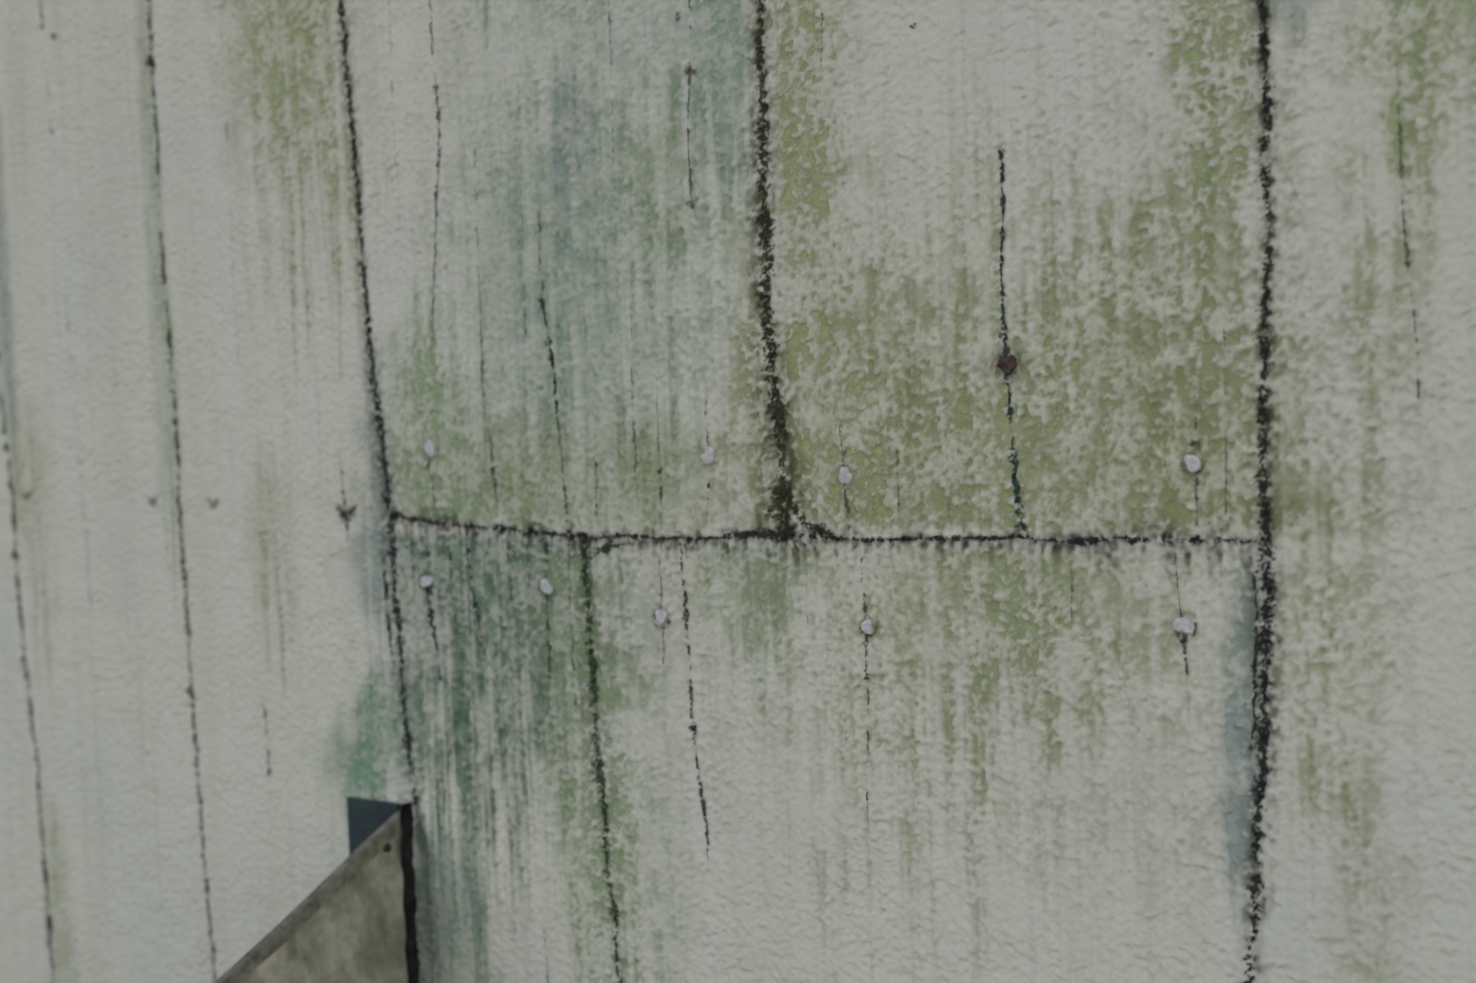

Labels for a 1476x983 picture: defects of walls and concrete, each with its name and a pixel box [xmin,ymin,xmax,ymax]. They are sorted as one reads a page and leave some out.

crack [0,389,55,983]
crack [146,0,216,981]
leakage [415,821,480,982]
crack [337,0,1276,983]
corrosion [996,355,1023,376]
leakage [1224,564,1258,883]